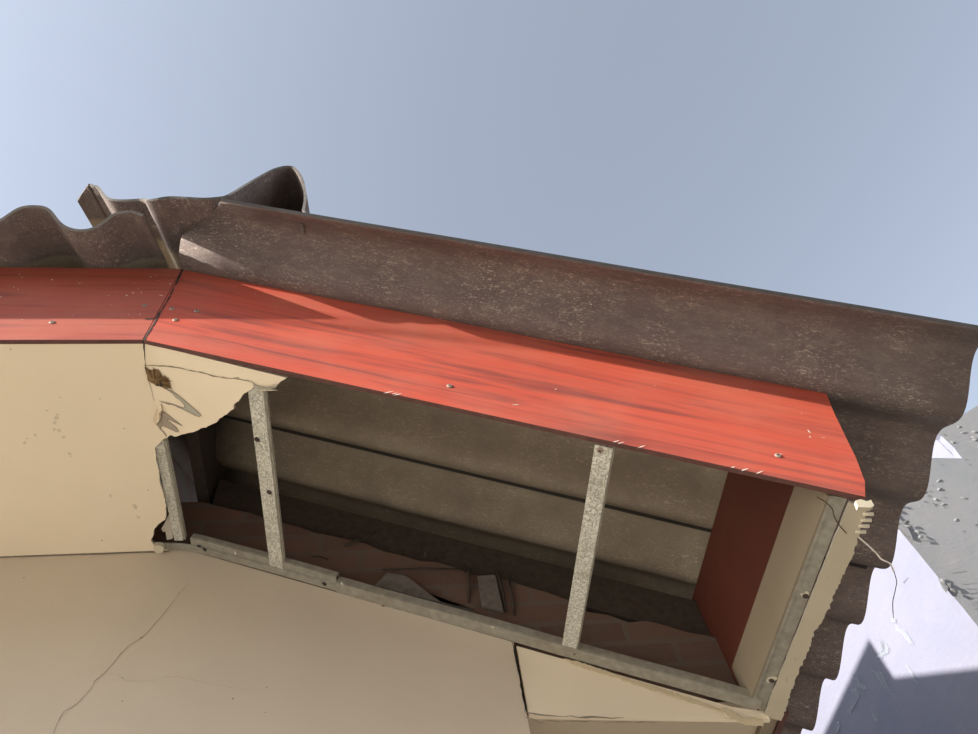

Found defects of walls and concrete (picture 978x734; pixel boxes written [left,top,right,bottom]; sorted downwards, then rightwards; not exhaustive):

spalling [153,515,173,554]
crack [53,579,245,734]